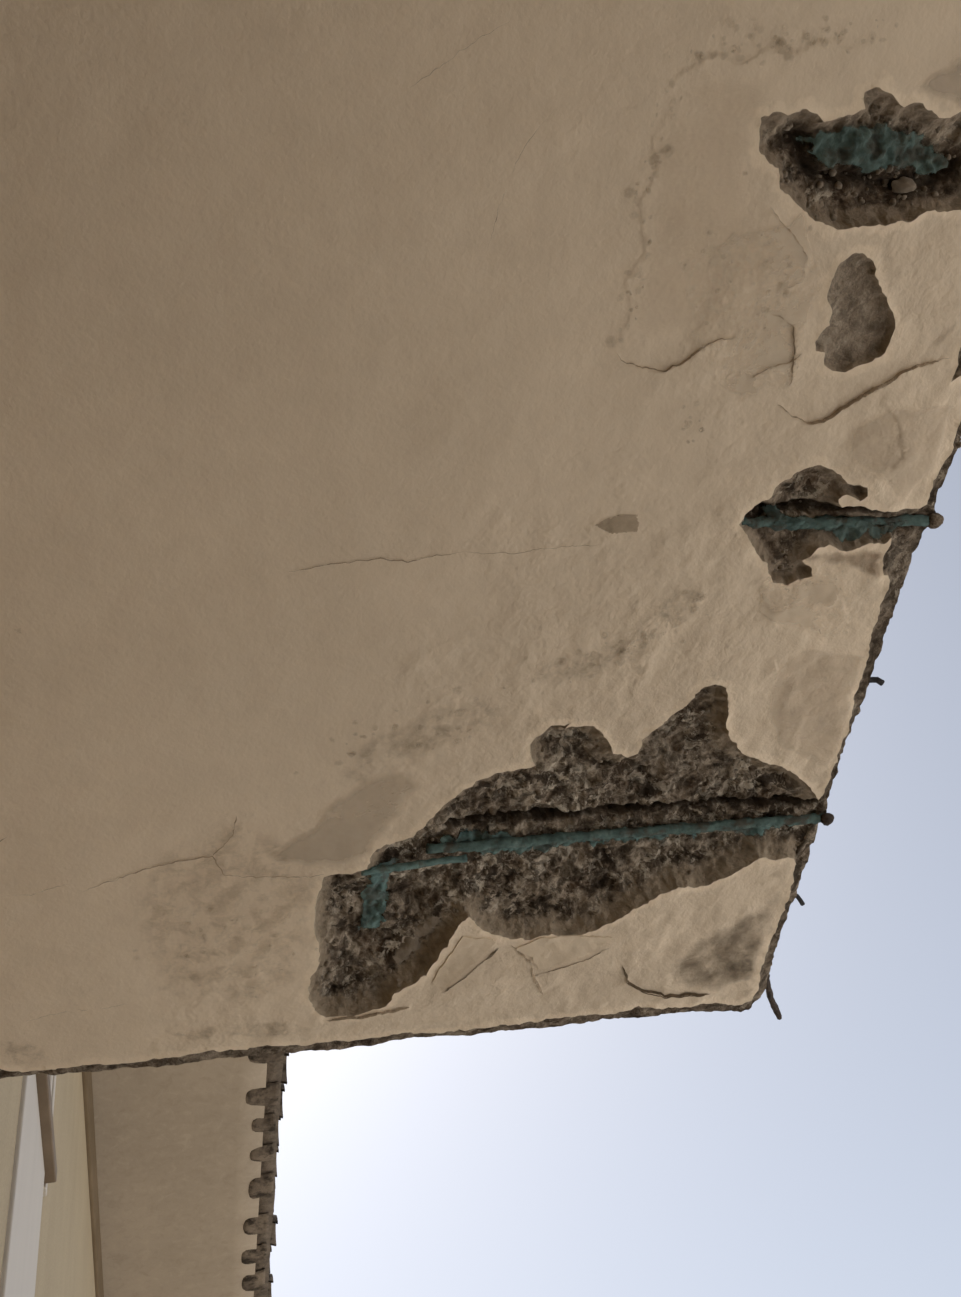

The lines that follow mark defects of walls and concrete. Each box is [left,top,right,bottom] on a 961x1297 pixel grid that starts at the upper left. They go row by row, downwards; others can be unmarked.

spalling [759,87,961,230]
crack [618,337,736,372]
crack [747,210,938,425]
spalling [815,253,895,372]
spalling [951,348,961,382]
crack [289,545,596,572]
spalling [0,422,961,1079]
crack [83,817,324,892]
crack [511,934,709,999]